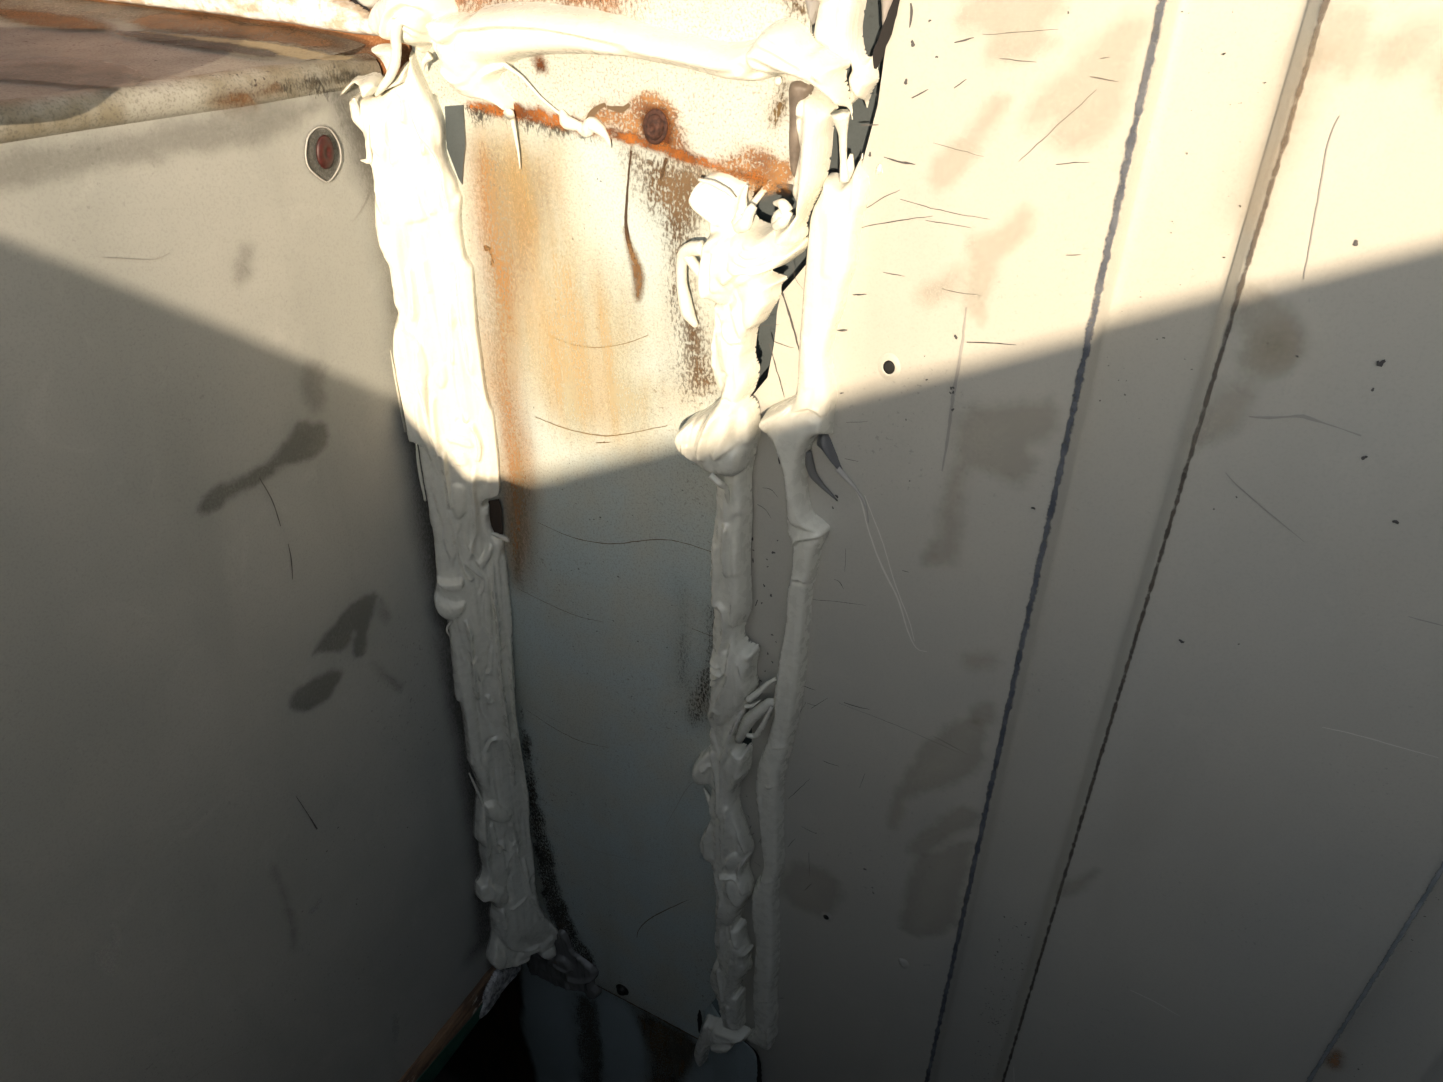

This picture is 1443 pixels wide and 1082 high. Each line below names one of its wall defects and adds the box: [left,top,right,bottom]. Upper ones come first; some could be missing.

corrosion [455,0,514,13]
corrosion [541,0,627,12]
corrosion [768,83,787,126]
corrosion [469,91,793,396]
corrosion [476,148,537,575]